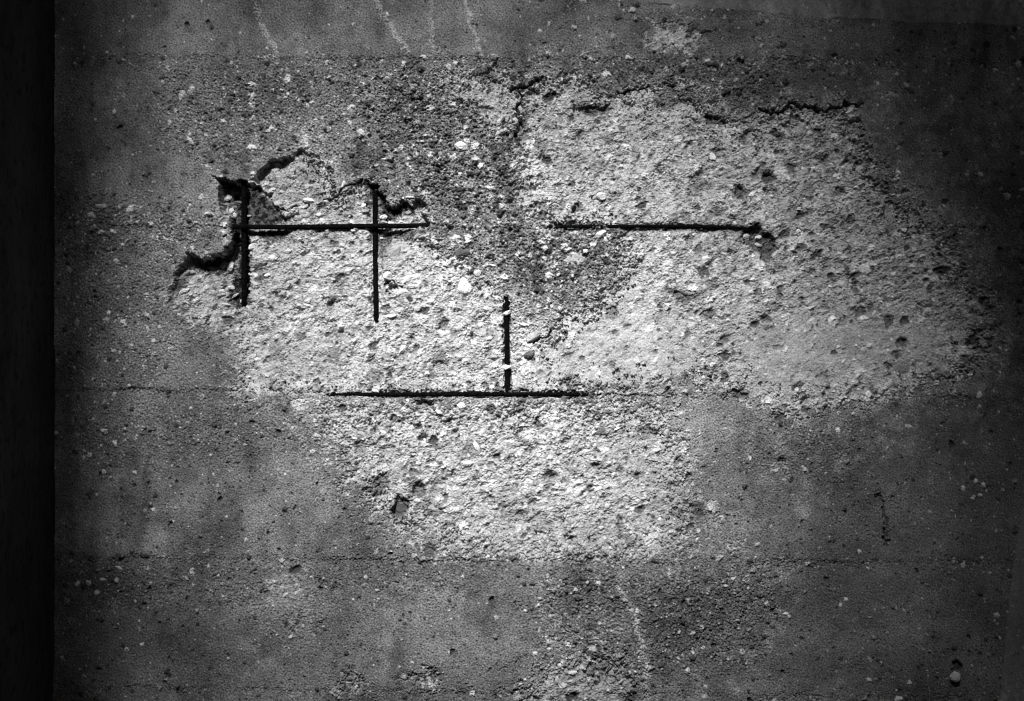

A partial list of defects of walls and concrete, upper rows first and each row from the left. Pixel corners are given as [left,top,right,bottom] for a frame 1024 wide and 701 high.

crack [510,76,544,147]
crack [618,85,650,96]
crack [758,101,860,117]
crack [278,179,363,212]
spalling [153,11,1024,568]
spalling [253,547,336,630]